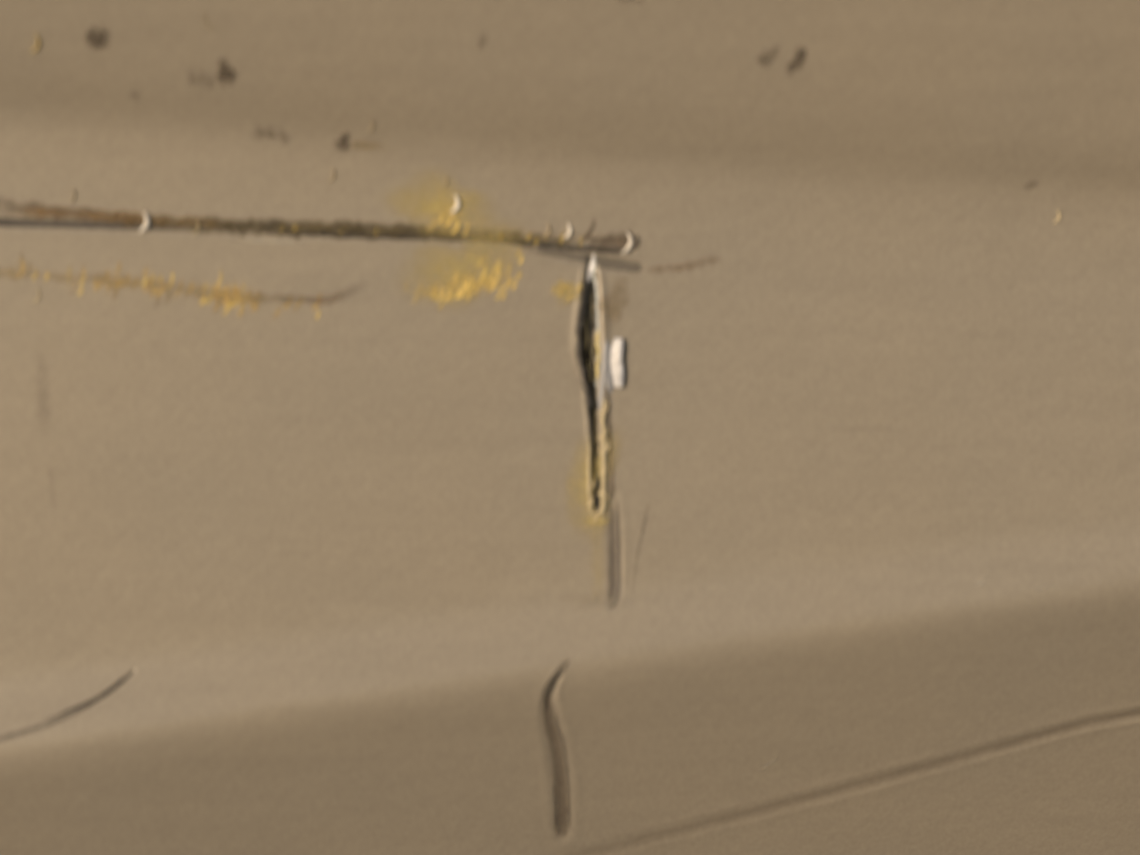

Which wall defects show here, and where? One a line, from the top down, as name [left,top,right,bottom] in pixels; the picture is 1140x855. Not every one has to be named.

crack [1,672,133,739]